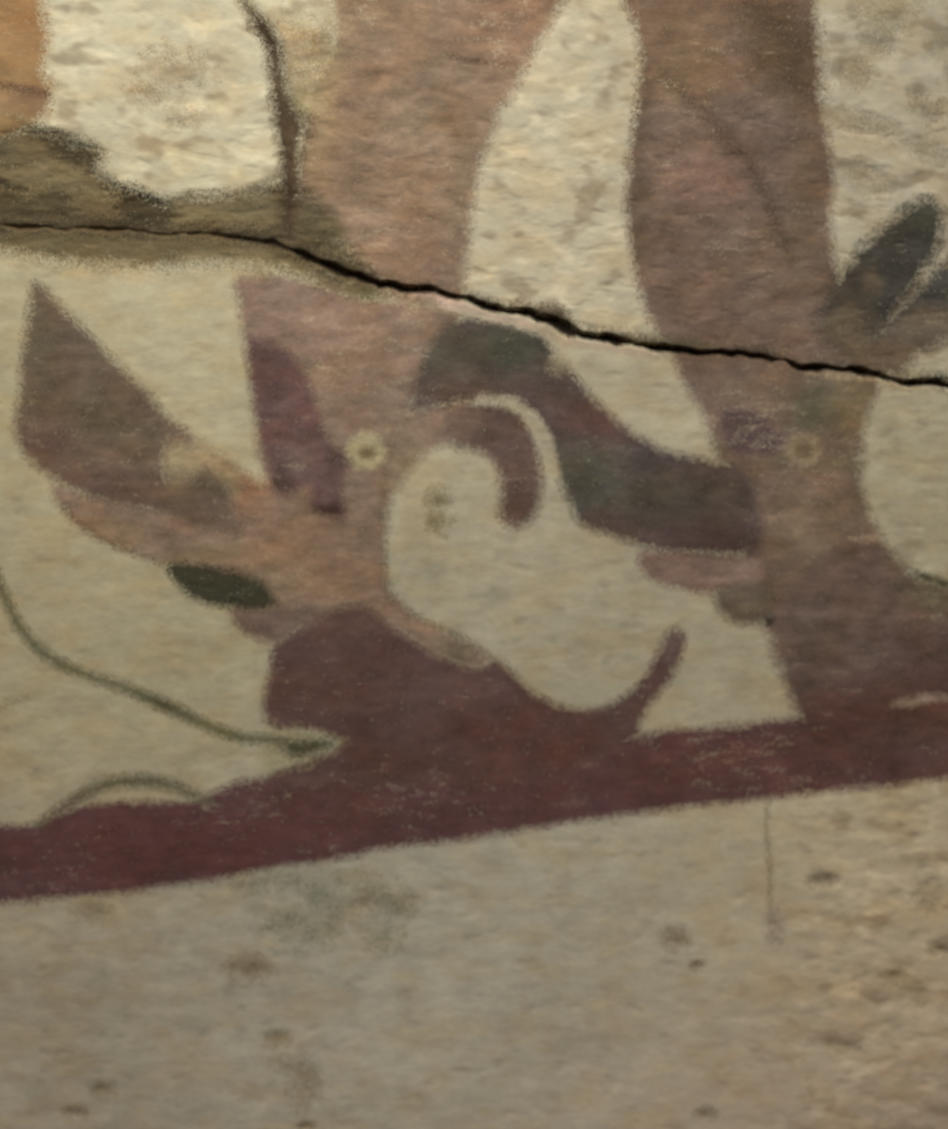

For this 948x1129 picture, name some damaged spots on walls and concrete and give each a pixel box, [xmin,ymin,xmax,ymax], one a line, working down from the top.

crack [0,0,948,396]